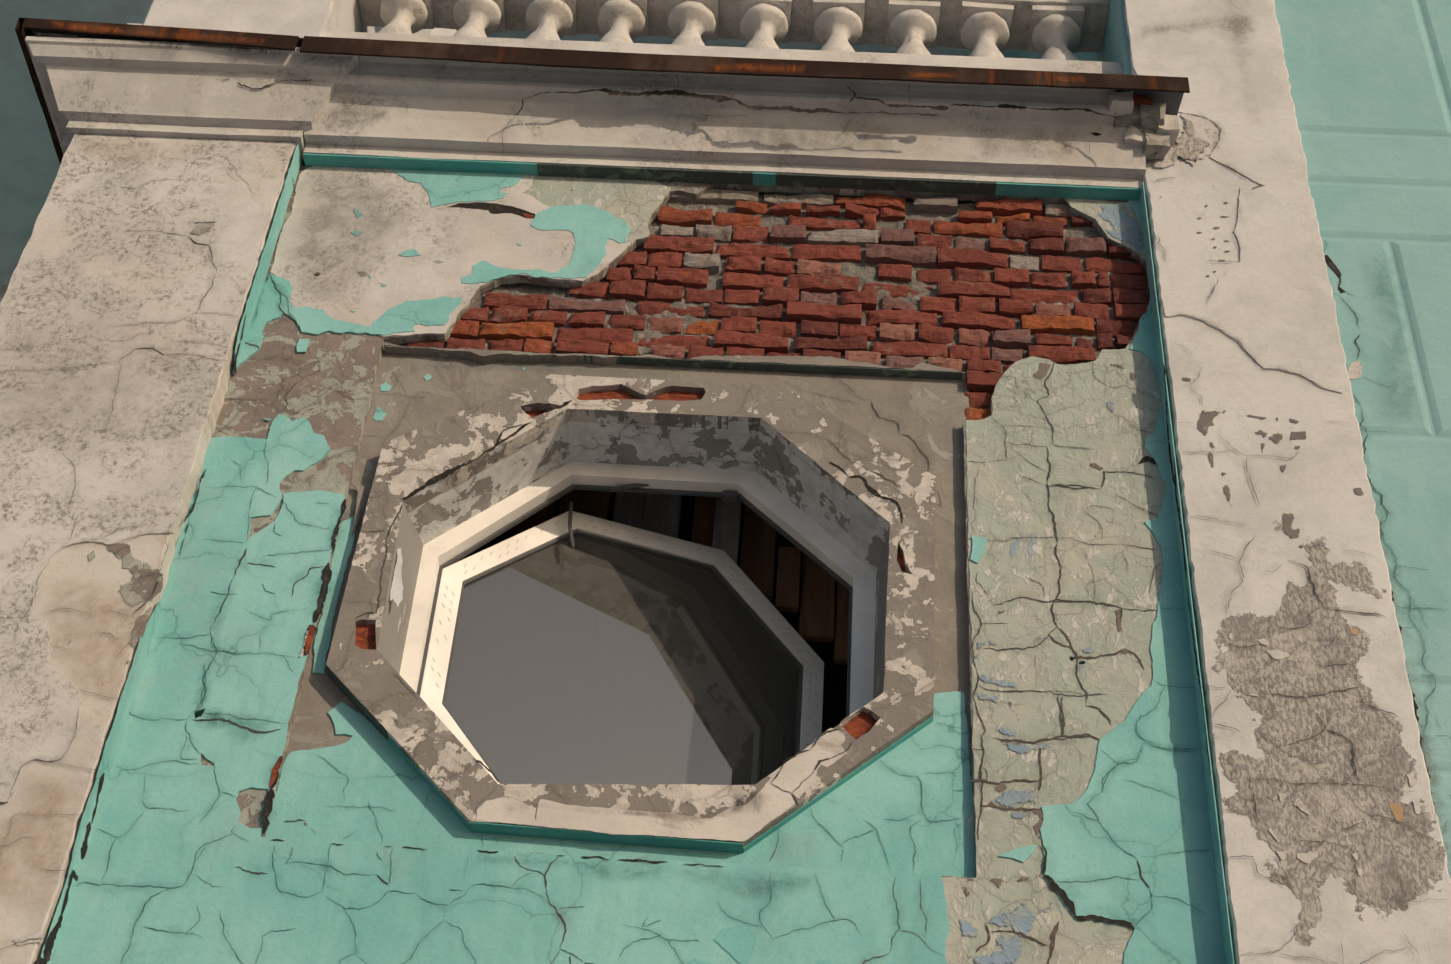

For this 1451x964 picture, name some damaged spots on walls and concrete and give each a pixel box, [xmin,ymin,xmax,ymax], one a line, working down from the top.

crack [7,222,295,432]
crack [214,71,312,90]
crack [0,400,725,964]
flaking render [231,166,1167,964]
crack [502,76,1176,182]
crack [719,114,1450,964]
peeling [1197,410,1307,506]
flaking render [1211,513,1450,946]